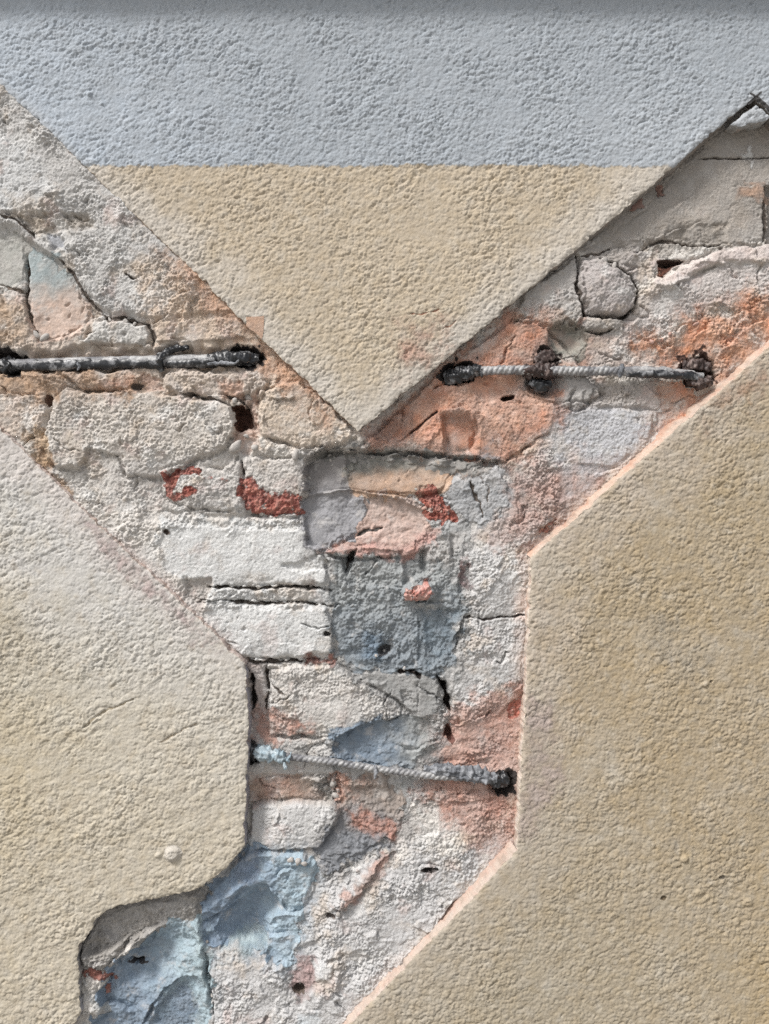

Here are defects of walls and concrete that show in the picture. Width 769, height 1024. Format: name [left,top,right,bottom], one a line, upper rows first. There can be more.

crack [702,155,769,163]
crack [0,214,35,238]
crack [1,262,34,324]
crack [59,259,157,346]
crack [574,240,727,335]
spalling [160,466,306,517]
spalling [416,484,458,526]
crack [209,527,382,606]
spalling [404,579,432,601]
crack [397,669,450,709]
spalling [507,696,522,719]
spalling [82,967,118,993]